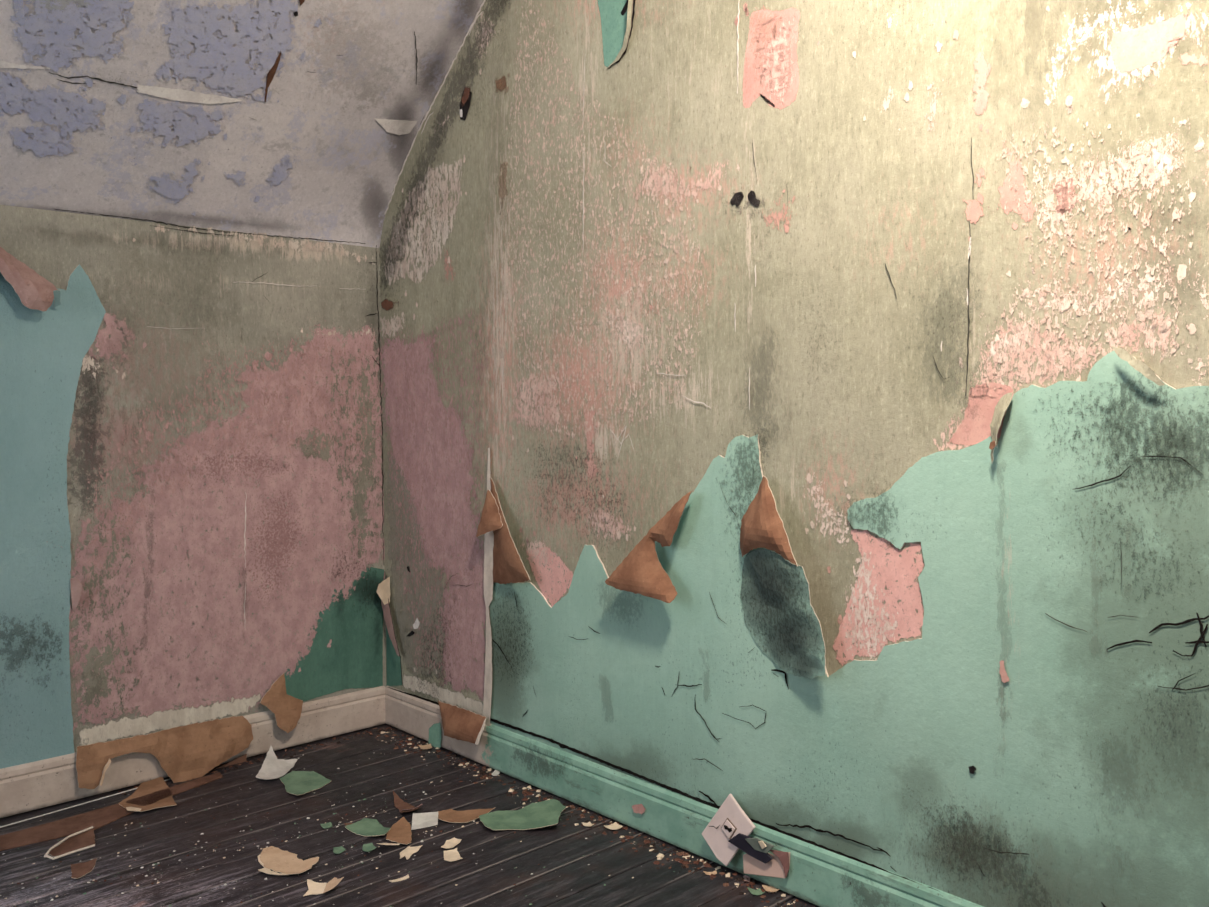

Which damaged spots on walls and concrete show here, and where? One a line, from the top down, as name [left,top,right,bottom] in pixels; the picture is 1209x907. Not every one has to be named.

crack [49,72,137,88]
peeling [0,0,305,163]
spalling [434,86,472,133]
peeling [503,0,801,541]
peeling [931,0,1209,451]
crack [55,209,384,562]
peeling [67,155,486,746]
mould [740,548,826,679]
peeling [804,472,924,666]
crack [1045,613,1209,691]
crack [490,666,766,829]
crack [749,818,938,891]